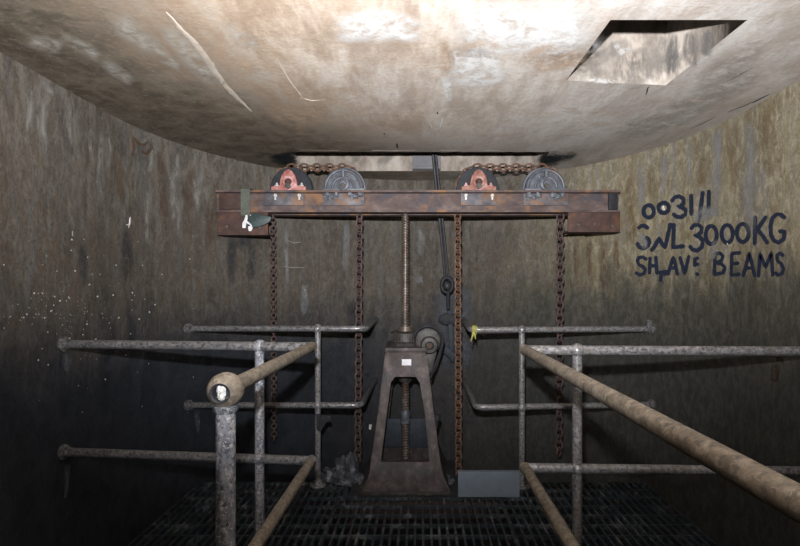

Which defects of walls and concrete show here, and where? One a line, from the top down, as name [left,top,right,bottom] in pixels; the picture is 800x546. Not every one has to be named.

leakage [25,95,47,148]